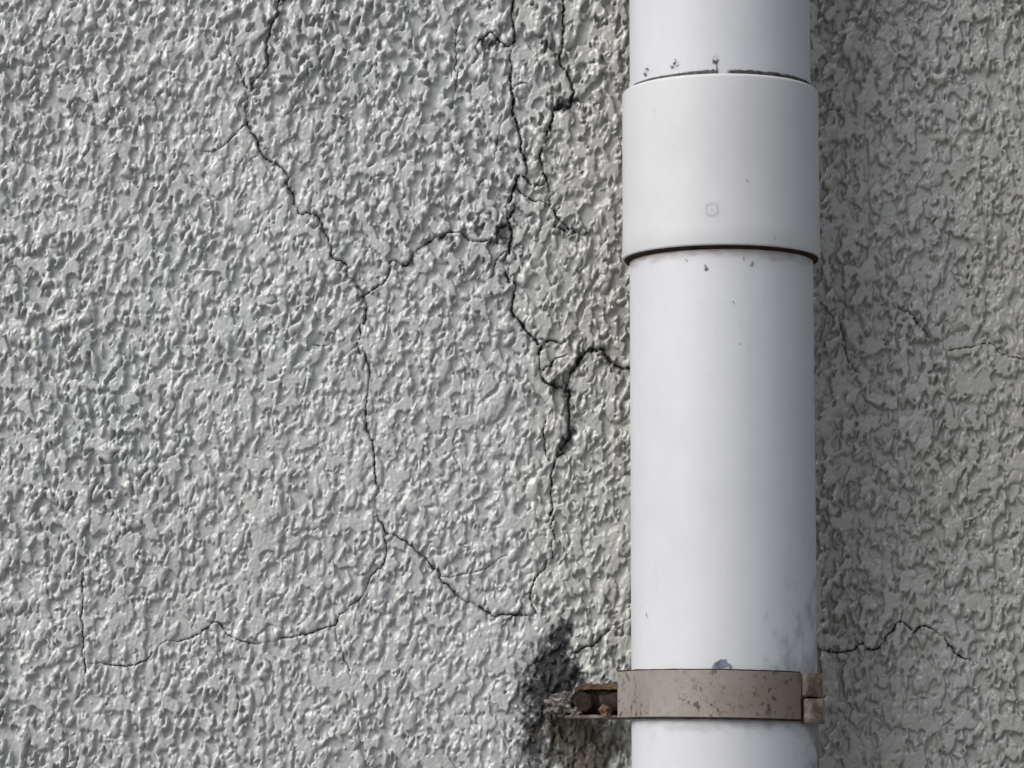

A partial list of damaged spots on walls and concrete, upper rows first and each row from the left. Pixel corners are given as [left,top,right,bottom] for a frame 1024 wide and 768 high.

crack [72,0,630,704]
damp [517,617,586,768]
corrosion [532,698,807,768]
crack [818,603,968,659]